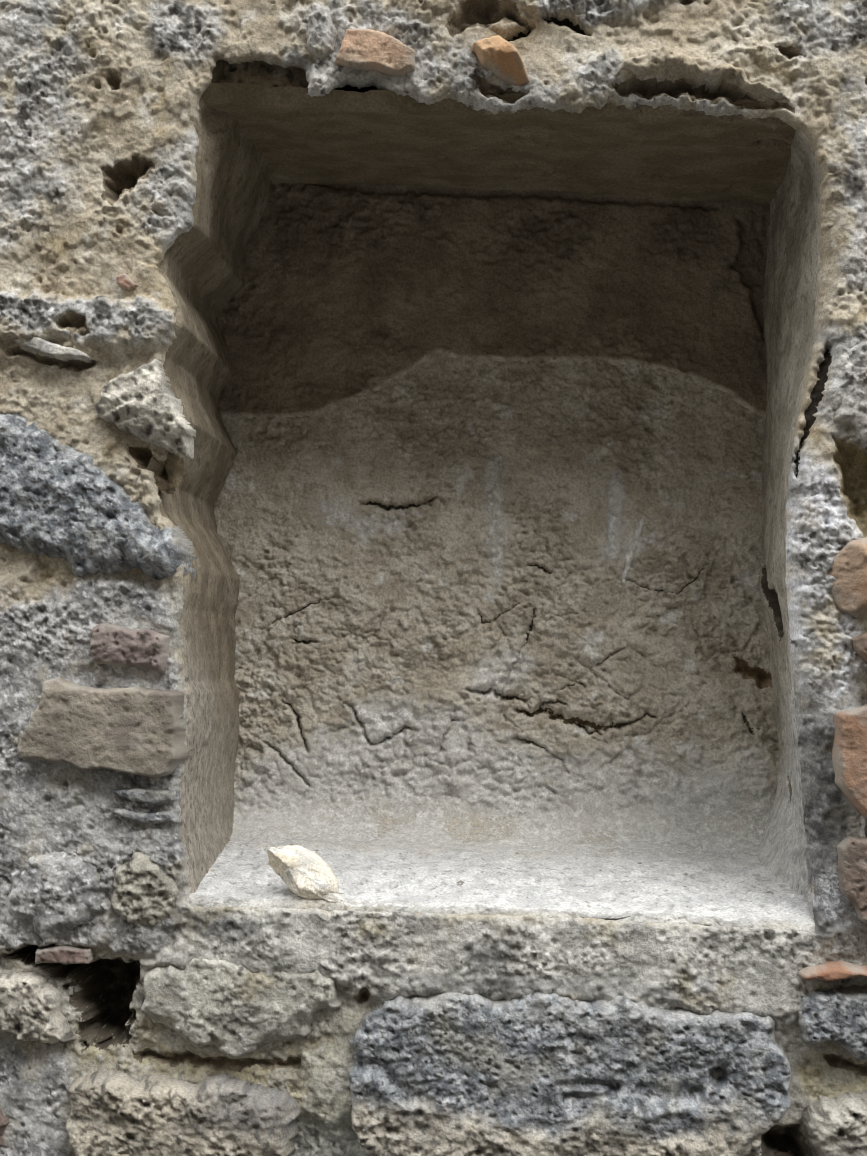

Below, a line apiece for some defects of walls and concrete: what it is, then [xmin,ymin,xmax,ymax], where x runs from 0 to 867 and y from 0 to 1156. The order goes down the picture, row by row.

crack [794,349,832,478]
crack [366,498,435,511]
crack [632,569,703,593]
crack [272,599,328,644]
crack [469,604,655,760]
crack [266,701,310,786]
crack [346,703,410,745]